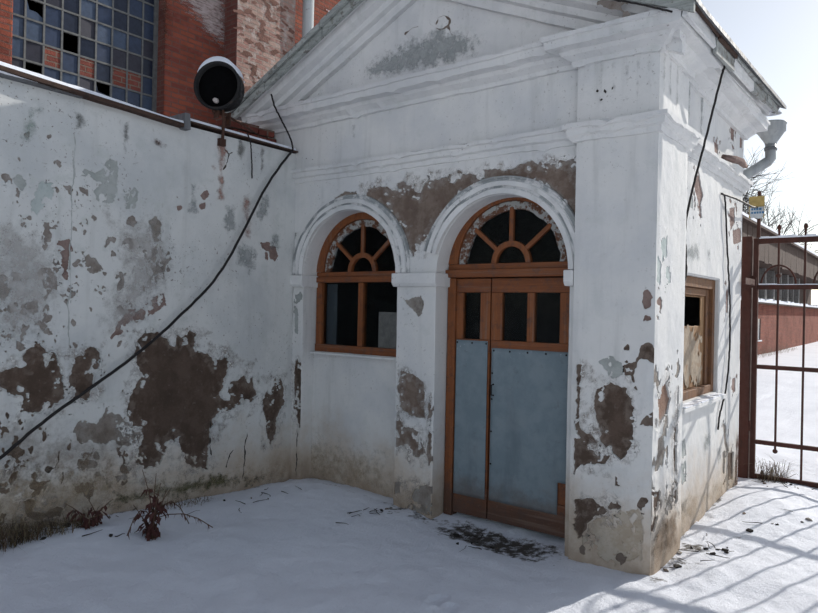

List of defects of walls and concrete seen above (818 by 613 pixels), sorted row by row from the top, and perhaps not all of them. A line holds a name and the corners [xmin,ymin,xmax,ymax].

spalling [233,0,295,94]
water stain [369,30,474,74]
peeling [1,173,26,203]
peeling [20,159,138,227]
peeling [260,242,278,261]
flaking render [335,157,576,256]
flaking render [690,166,702,219]
peeling [728,198,741,249]
flaking render [0,215,171,523]
flaking render [67,328,301,501]
flaking render [396,371,434,466]
peeling [573,343,686,566]